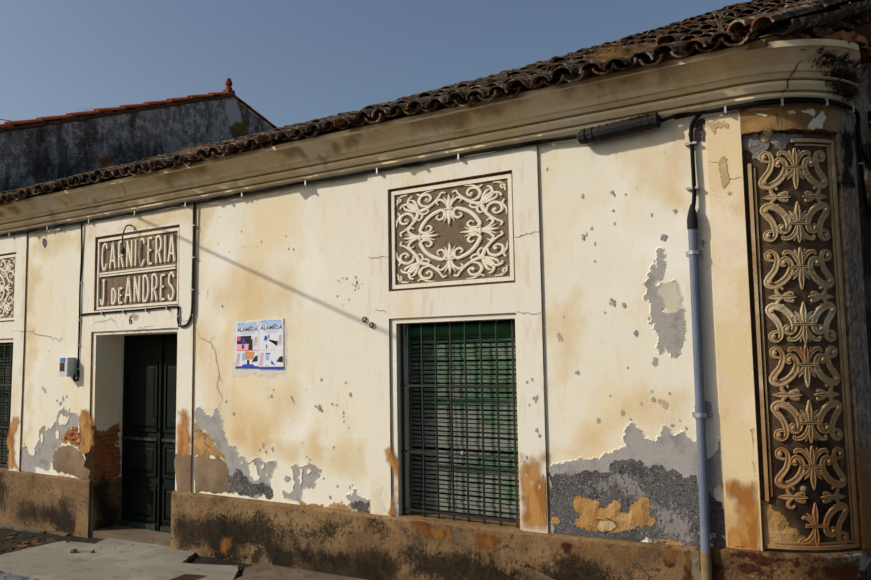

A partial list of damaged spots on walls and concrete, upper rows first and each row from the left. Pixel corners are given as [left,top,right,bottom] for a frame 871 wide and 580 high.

water stain [225,98,249,138]
flaking render [742,109,826,160]
crack [743,60,837,136]
water stain [811,43,871,105]
water stain [837,129,871,283]
peeling [641,234,687,367]
water stain [0,417,19,509]
water stain [18,500,76,536]
peeling [21,395,121,481]
peeling [193,400,370,513]
water stain [174,510,621,580]
peeling [547,409,726,547]